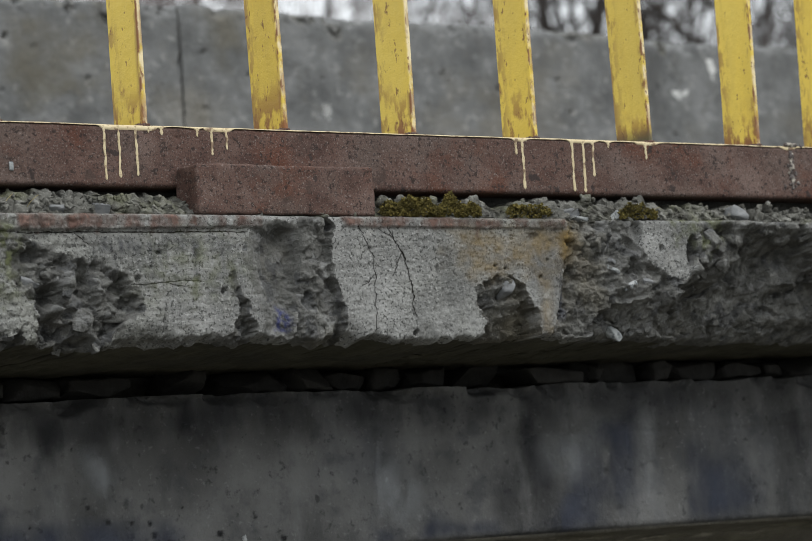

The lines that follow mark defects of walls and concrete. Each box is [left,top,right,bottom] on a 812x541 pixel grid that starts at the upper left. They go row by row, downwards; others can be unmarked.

spalling [0,233,146,356]
spalling [211,217,348,350]
crack [358,225,418,332]
spalling [465,272,542,345]
spalling [555,215,812,349]